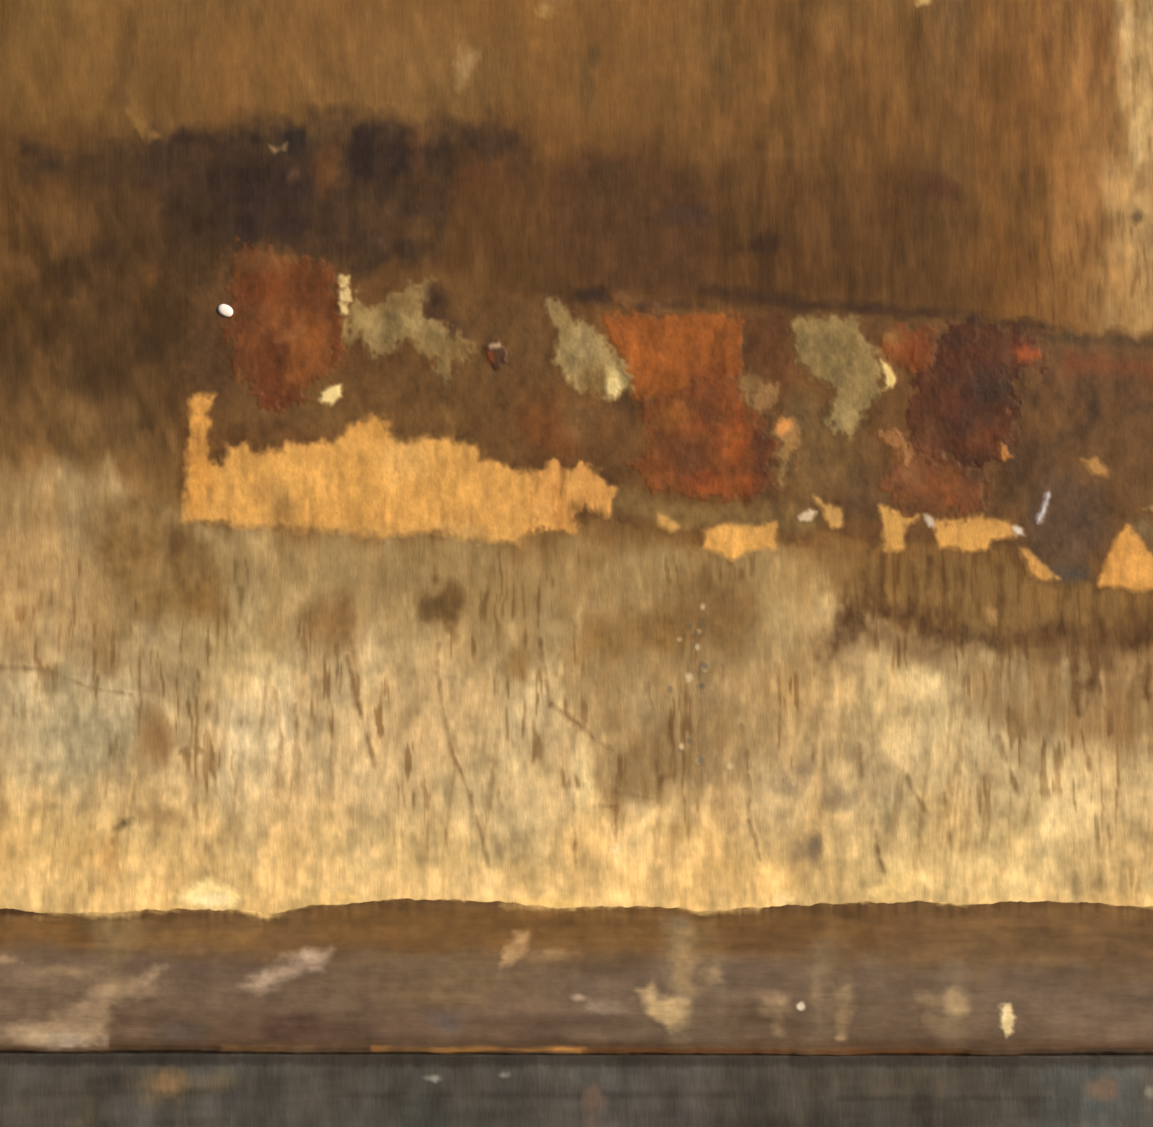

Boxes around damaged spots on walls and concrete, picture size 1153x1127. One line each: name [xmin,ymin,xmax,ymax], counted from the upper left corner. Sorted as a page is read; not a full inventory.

damp [0,90,729,443]
damp [79,457,239,635]
damp [293,580,366,712]
damp [406,536,477,646]
damp [502,635,536,691]
damp [557,562,775,674]
damp [803,548,1153,721]
damp [138,698,180,775]
damp [134,801,188,832]
damp [585,726,709,849]
damp [785,828,827,870]
damp [758,752,863,815]